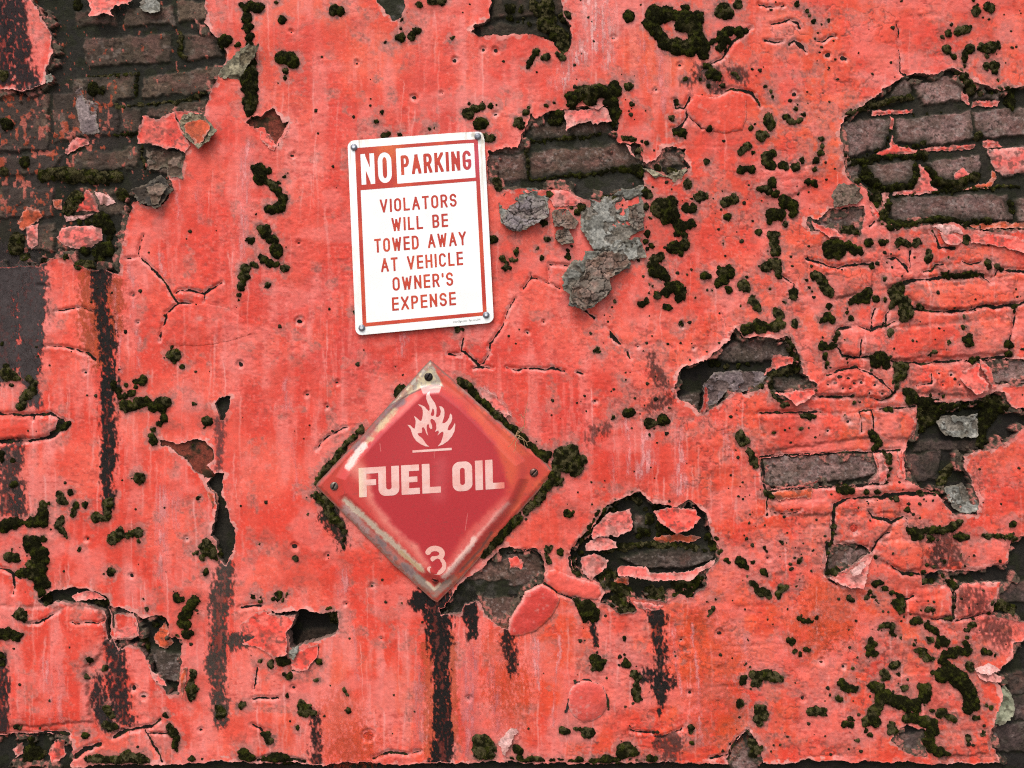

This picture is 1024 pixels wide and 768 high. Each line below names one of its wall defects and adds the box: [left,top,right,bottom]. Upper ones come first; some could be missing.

damp [90,268,121,515]
spalling [0,0,259,274]
crack [127,235,222,340]
crack [448,264,583,374]
spalling [487,106,689,311]
crack [584,310,630,359]
crack [759,230,1024,600]
spalling [806,70,1024,253]
damp [205,560,256,729]
damp [407,587,479,763]
spalling [0,640,1024,768]
damp [639,604,682,716]